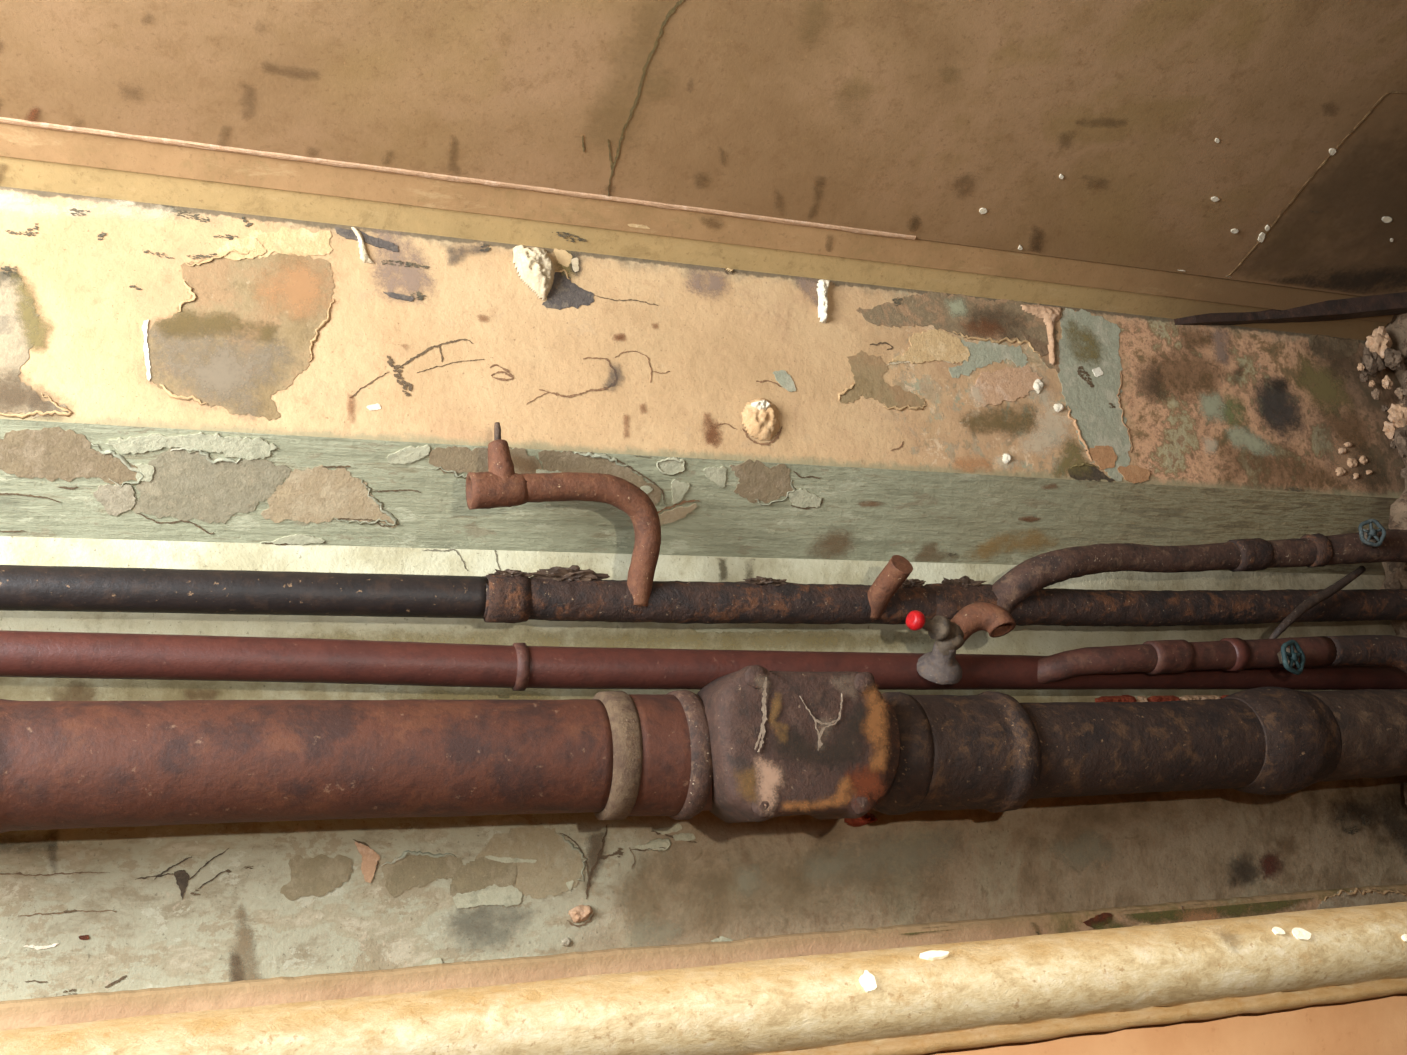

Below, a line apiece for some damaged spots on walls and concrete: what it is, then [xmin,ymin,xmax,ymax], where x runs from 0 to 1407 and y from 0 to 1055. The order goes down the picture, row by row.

crack [582,0,684,196]
flaking render [448,244,491,262]
flaking render [542,252,659,310]
peeling [142,226,431,421]
peeling [0,271,421,546]
peeling [838,291,1150,484]
damp [1141,330,1383,492]
peeling [387,445,488,479]
peeling [509,447,700,525]
peeling [703,459,823,510]
flaking render [1317,887,1407,909]